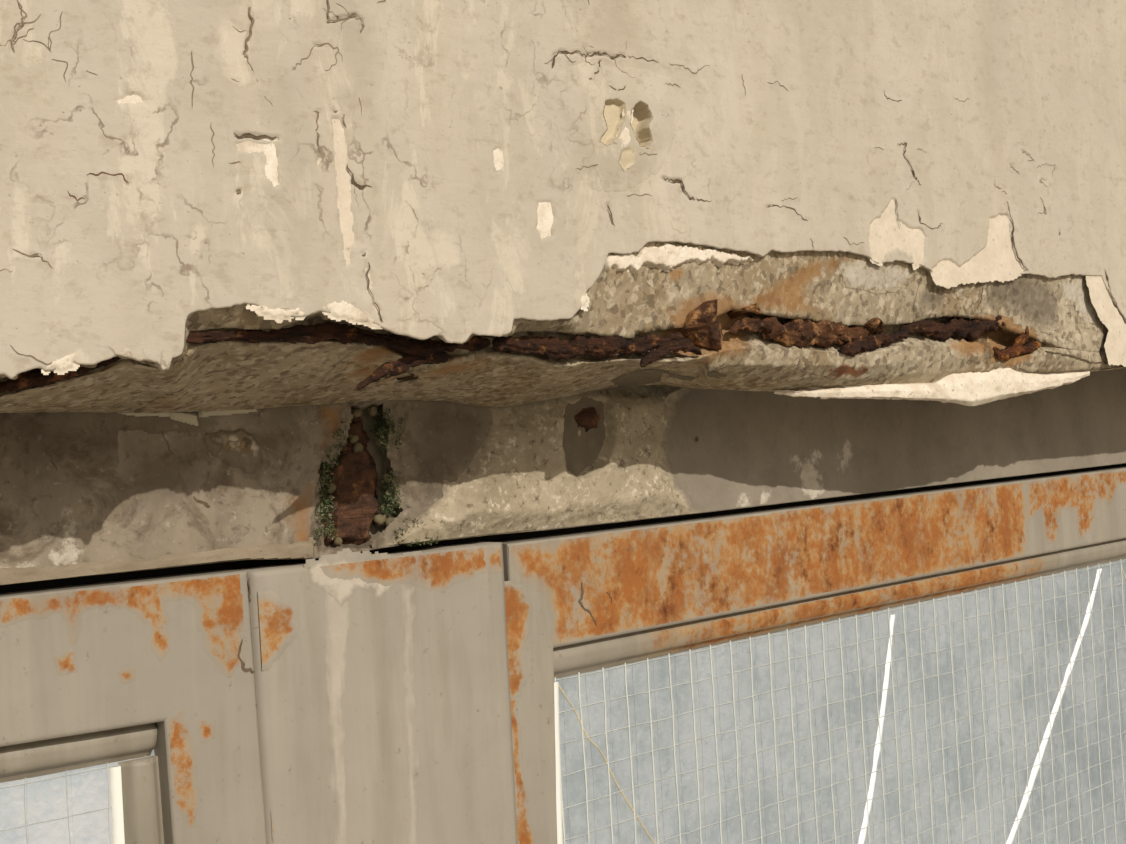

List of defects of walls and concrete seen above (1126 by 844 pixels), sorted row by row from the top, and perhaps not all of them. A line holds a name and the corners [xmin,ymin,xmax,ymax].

crack [0,0,97,82]
crack [190,51,279,167]
peeling [236,137,280,187]
peeling [332,119,354,266]
peeling [616,109,634,147]
crack [546,45,710,91]
crack [607,152,711,226]
rust [0,356,121,392]
rust [186,251,1042,464]
spalling [0,199,1126,844]
rust [0,574,246,678]
rust [276,470,1126,844]